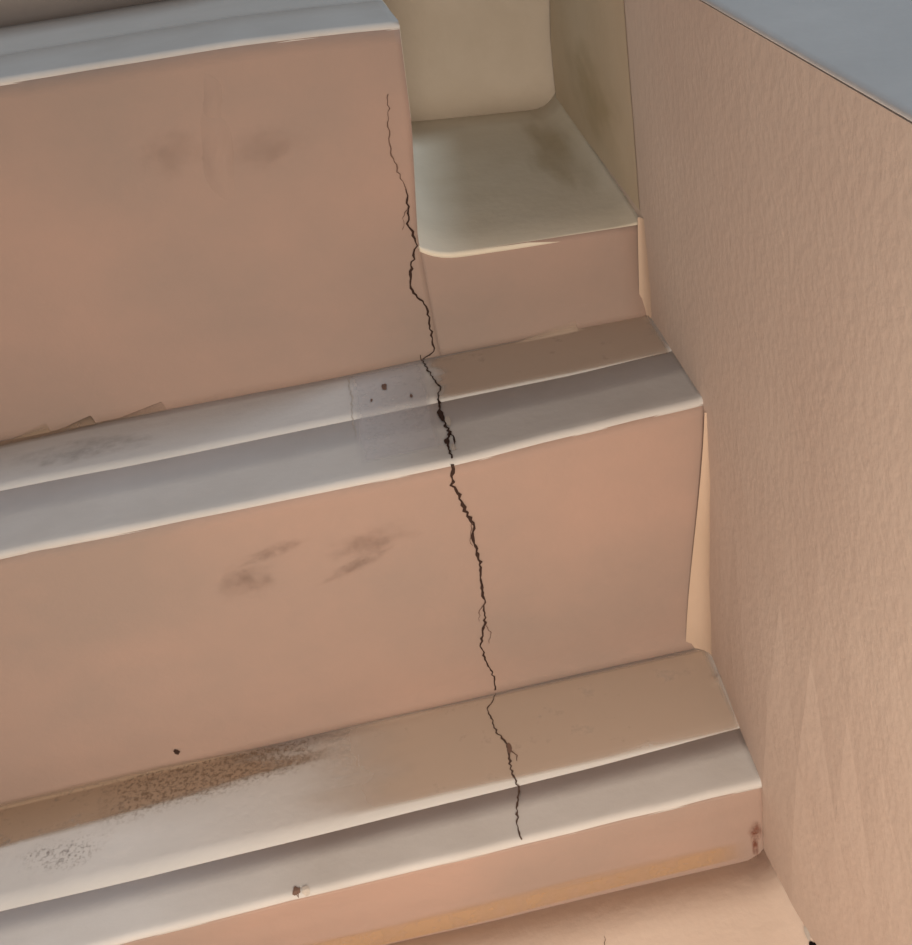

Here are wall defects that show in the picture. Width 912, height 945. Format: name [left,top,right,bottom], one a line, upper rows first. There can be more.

crack [387,95,522,840]